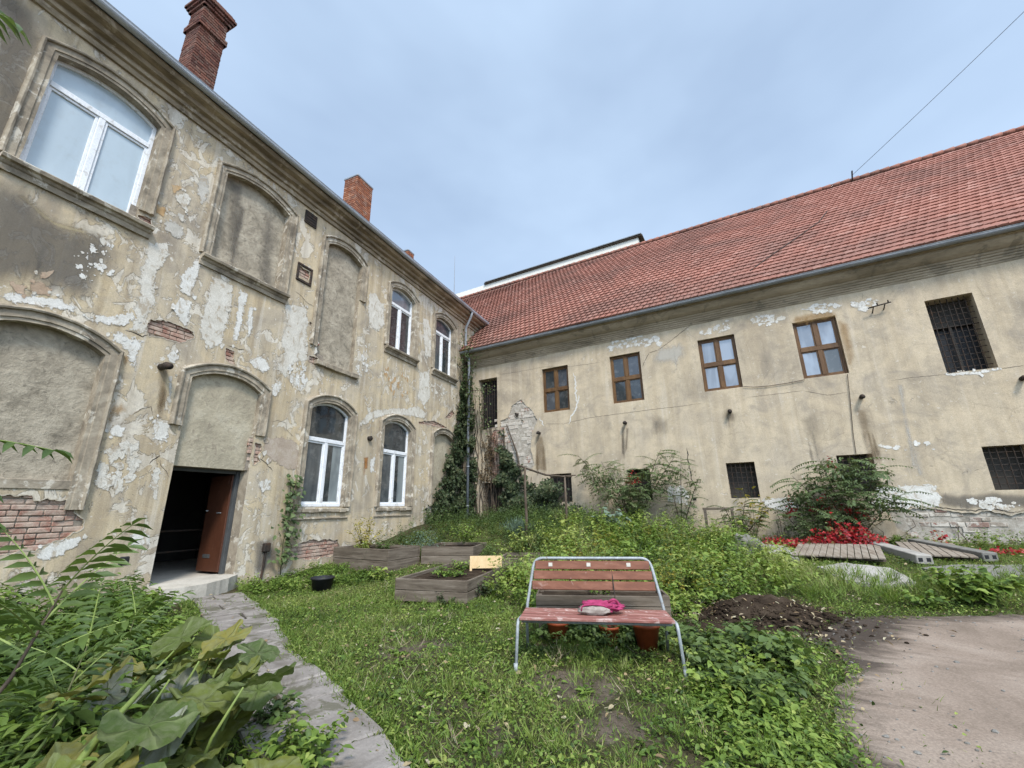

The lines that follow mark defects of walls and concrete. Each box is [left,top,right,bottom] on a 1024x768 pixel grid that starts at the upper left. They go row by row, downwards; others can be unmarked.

peeling [3,184,256,442]
peeling [250,304,323,396]
peeling [368,292,385,331]
peeling [607,335,663,352]
peeling [699,320,730,335]
peeling [750,314,786,326]
peeling [801,298,879,315]
crack [507,362,701,423]
peeling [94,425,161,500]
spalling [487,399,538,477]
spalling [0,494,88,560]
spalling [869,483,1024,545]